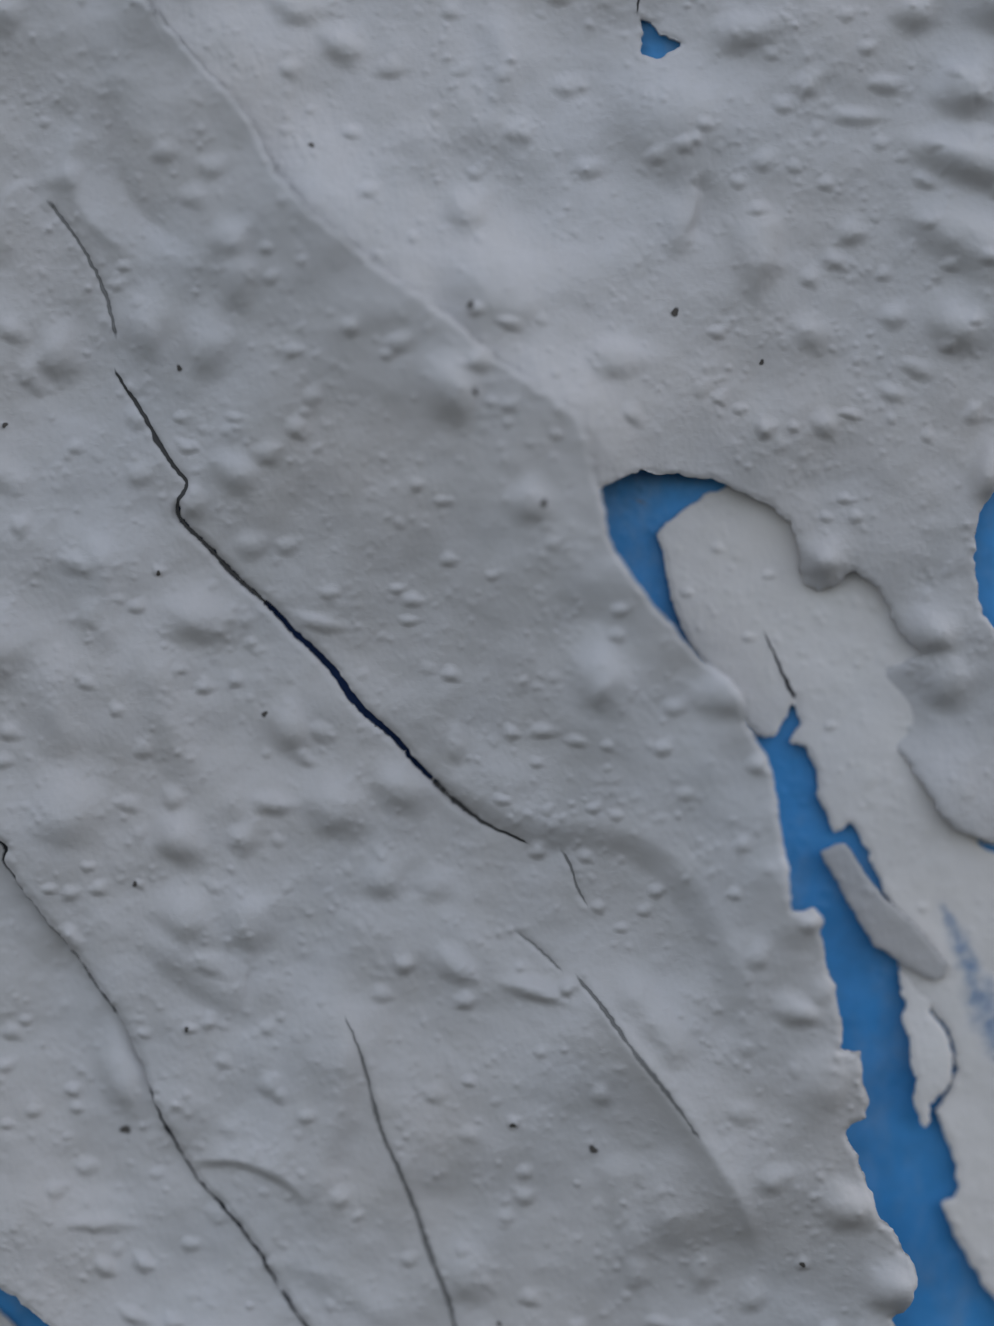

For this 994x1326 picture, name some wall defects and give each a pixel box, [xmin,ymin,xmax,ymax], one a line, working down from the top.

peeling [640,21,680,59]
crack [51,204,116,334]
crack [115,371,526,843]
crack [0,841,118,1013]
crack [564,854,585,902]
peeling [600,470,994,1326]
crack [150,1086,308,1326]
crack [346,1020,456,1326]
peeling [0,1288,49,1326]